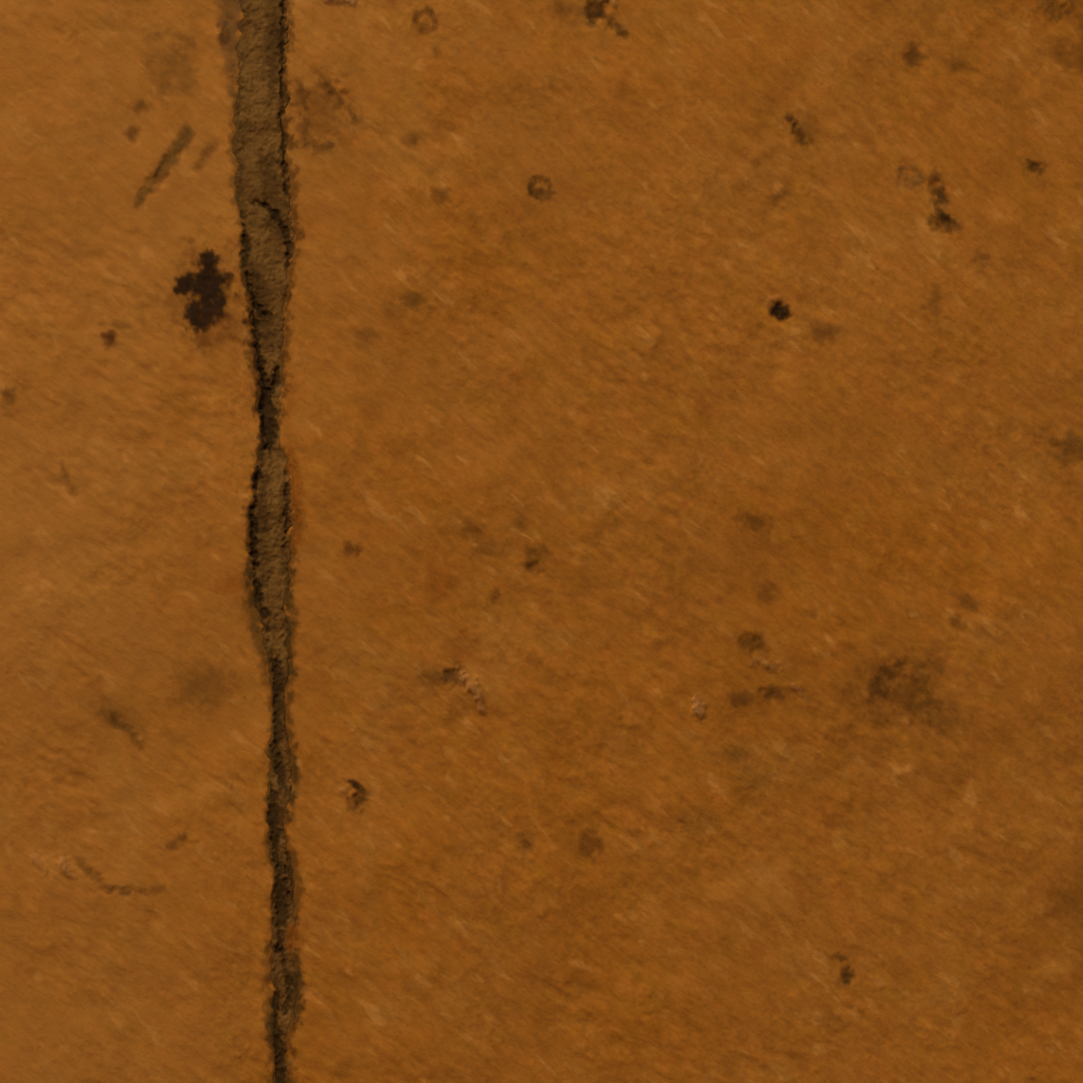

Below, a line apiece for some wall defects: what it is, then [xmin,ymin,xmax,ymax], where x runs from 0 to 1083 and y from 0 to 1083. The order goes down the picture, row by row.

leakage [173,251,231,330]
crack [232,0,303,1083]